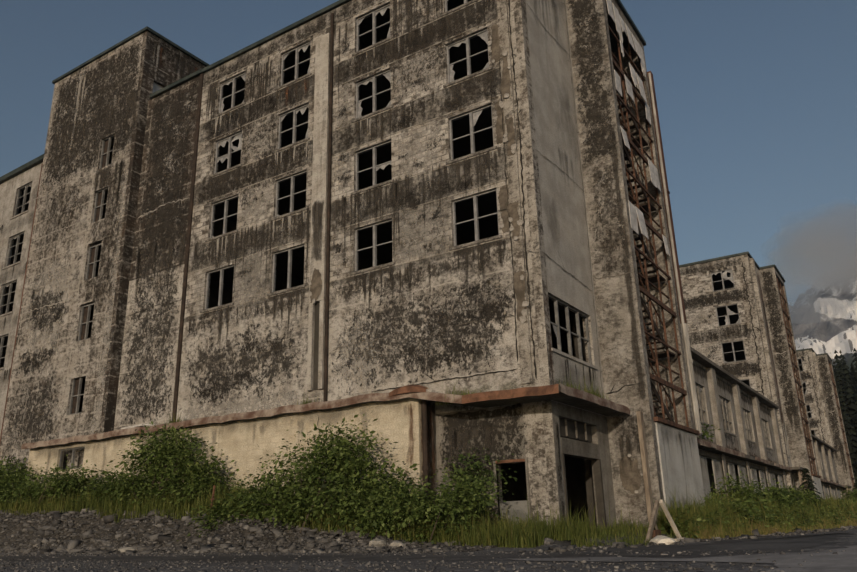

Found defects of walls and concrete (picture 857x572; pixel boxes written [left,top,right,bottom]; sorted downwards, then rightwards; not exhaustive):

water stain [34,37,143,434]
water stain [136,0,509,341]
water stain [334,313,379,392]
crack [737,263,835,442]